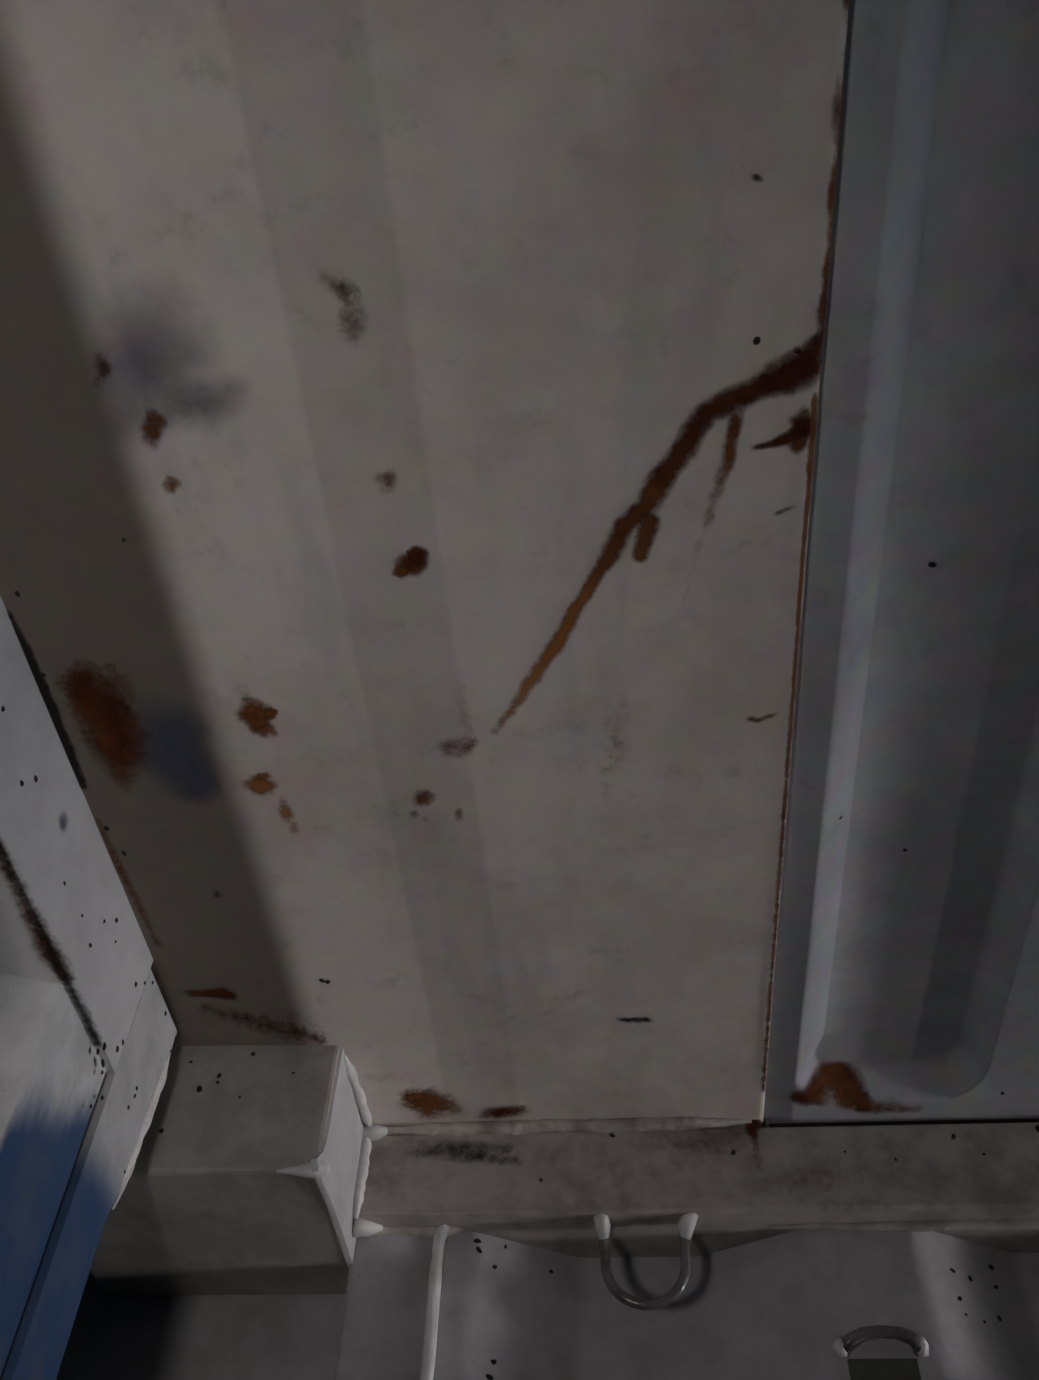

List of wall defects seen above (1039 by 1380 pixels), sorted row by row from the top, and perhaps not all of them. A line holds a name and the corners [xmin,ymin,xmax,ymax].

rust [393,546,428,577]
rust [499,49,846,1092]
rust [64,671,147,784]
rust [238,699,277,737]
rust [404,1089,461,1118]
rust [483,1106,525,1118]
rust [790,1062,919,1114]